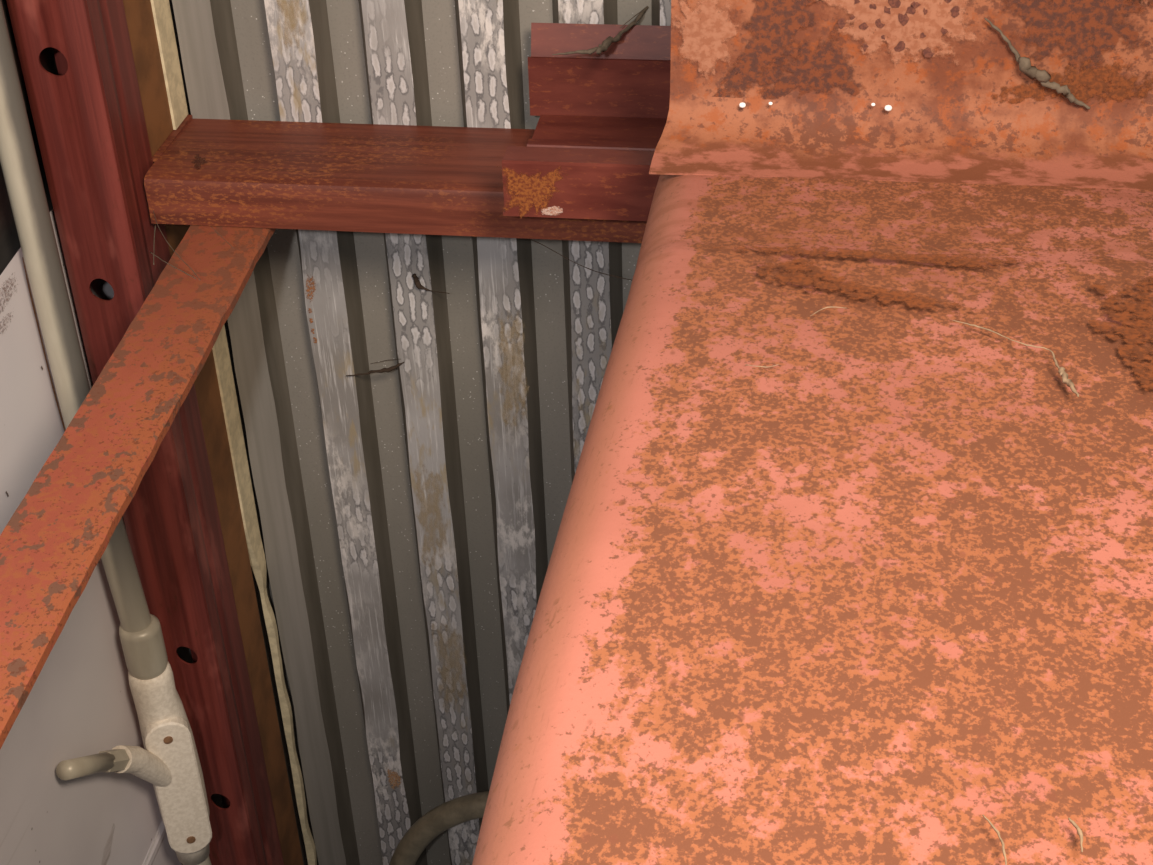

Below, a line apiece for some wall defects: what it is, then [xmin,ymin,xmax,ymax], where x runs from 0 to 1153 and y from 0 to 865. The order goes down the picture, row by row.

rust [714,0,864,99]
rust [993,0,1153,104]
rust [502,167,563,218]
rust [751,254,976,311]
rust [22,257,66,432]